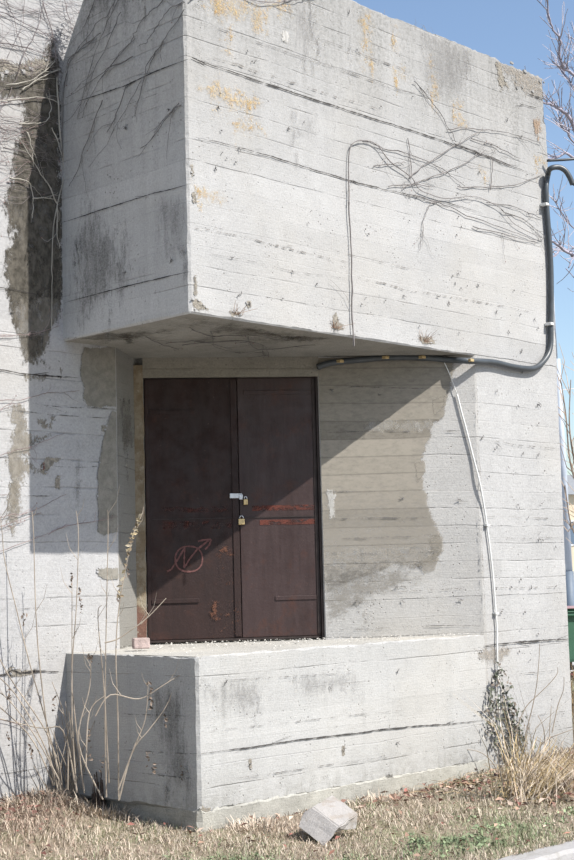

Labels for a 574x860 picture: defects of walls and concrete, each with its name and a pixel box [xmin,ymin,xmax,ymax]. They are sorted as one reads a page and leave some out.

spalling [0,56,52,77]
spalling [495,61,546,98]
peeling [80,346,130,536]